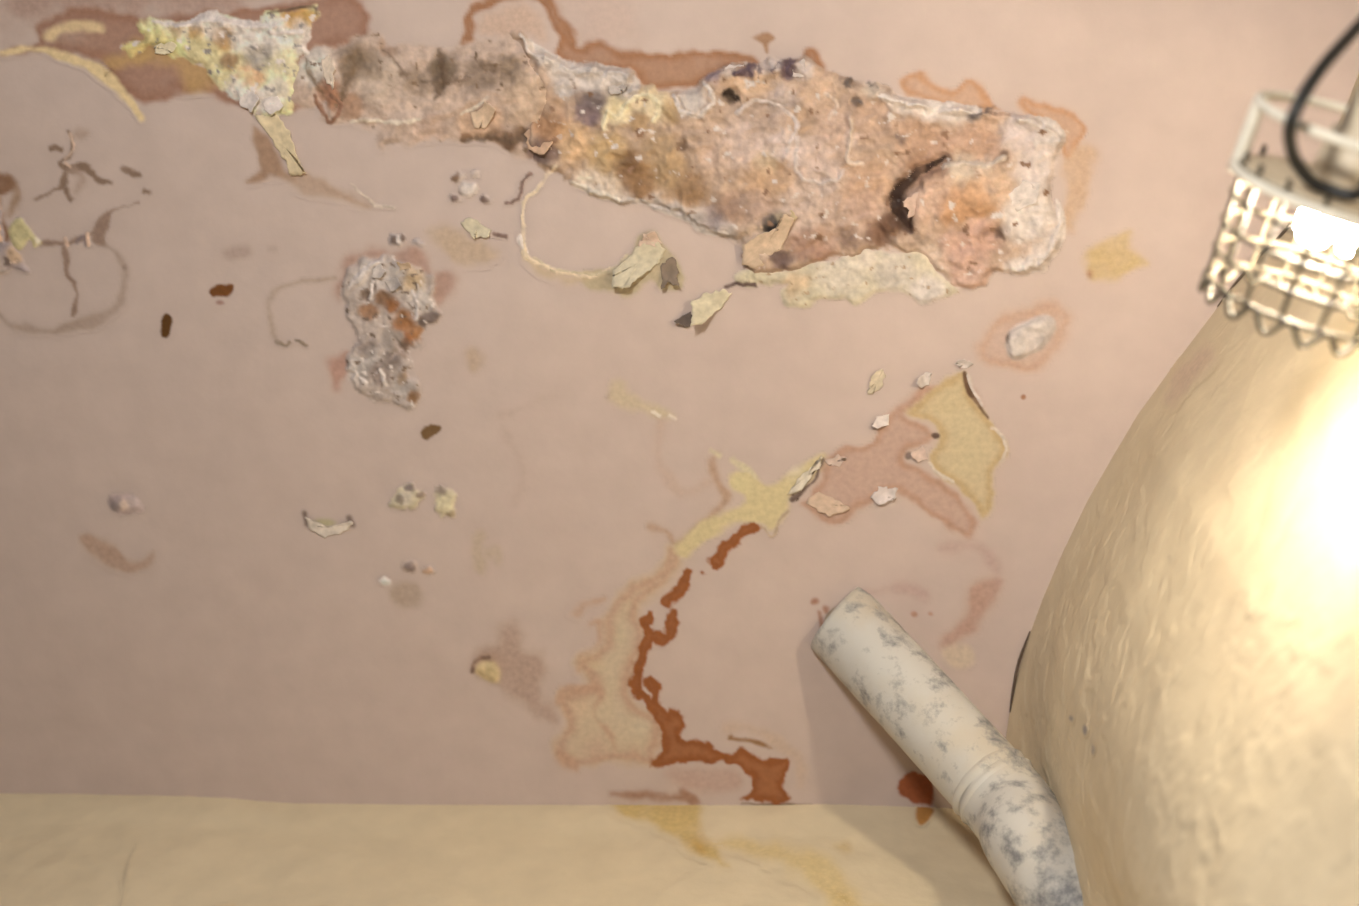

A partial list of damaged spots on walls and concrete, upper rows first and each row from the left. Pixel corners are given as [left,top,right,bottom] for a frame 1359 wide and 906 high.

leakage [0,0,377,125]
flaking render [118,1,397,215]
leakage [455,0,778,90]
peeling [0,168,45,277]
crack [30,123,155,316]
flaking render [319,26,1071,413]
peeling [299,508,357,538]
peeling [386,481,460,522]
peeling [790,293,1079,544]
leakage [462,374,896,906]
corrosion [625,521,812,805]
corrosion [895,769,937,828]